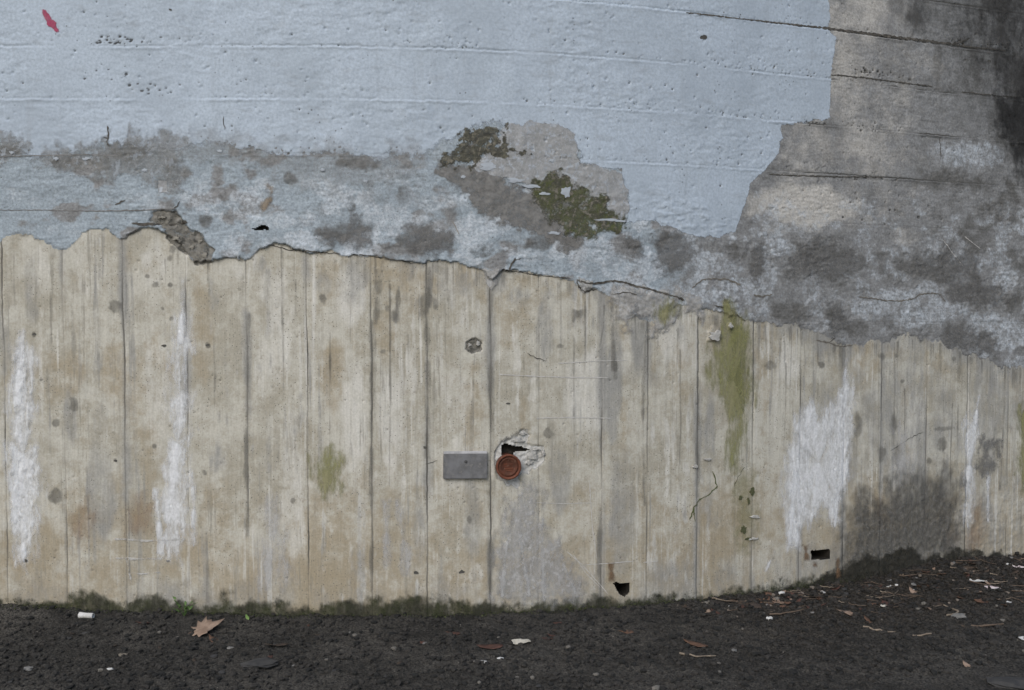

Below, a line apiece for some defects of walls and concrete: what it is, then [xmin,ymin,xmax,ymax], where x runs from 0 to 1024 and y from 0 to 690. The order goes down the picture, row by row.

water stain [981,0,1024,172]
spalling [150,210,215,265]
spalling [465,338,482,354]
peeling [434,120,630,255]
crack [503,258,772,321]
water stain [3,337,40,563]
water stain [154,313,195,557]
spalling [495,429,545,489]
crack [689,458,745,520]
water stain [784,369,854,551]
water stain [784,398,1003,591]
spalling [613,582,630,597]